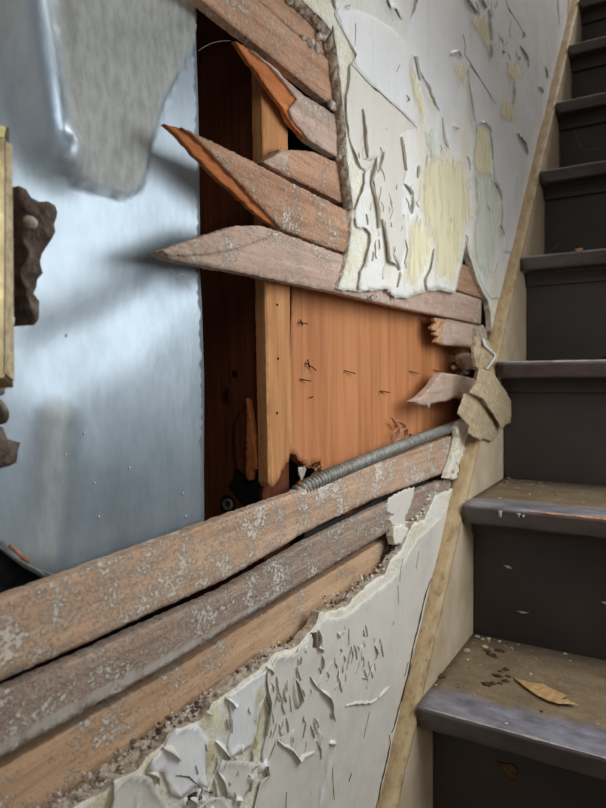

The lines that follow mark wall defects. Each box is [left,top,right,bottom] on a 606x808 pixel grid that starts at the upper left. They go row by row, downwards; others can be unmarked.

peeling [283,0,569,300]
peeling [34,421,469,808]